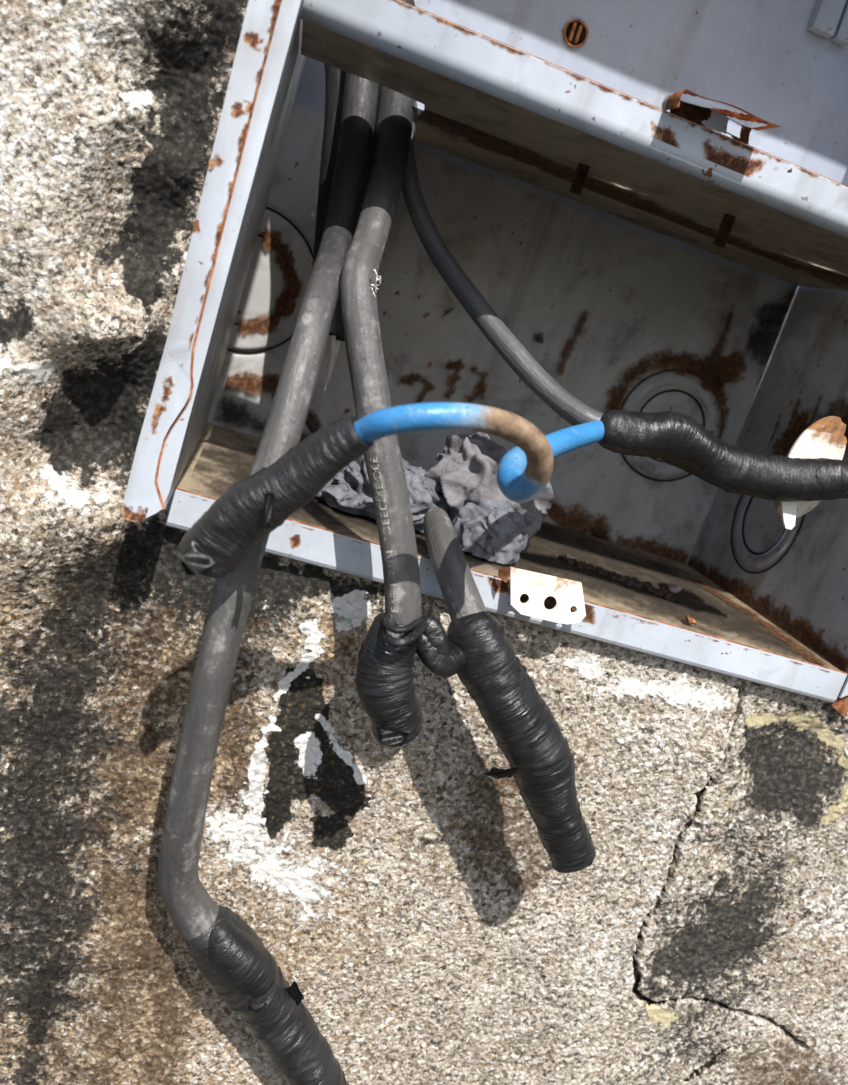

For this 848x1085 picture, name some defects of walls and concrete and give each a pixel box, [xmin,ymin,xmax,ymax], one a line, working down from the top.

water stain [91,0,245,484]
water stain [0,518,216,1085]
water stain [206,554,384,820]
crack [632,775,803,1044]
water stain [638,846,815,1006]
crack [684,1044,743,1081]